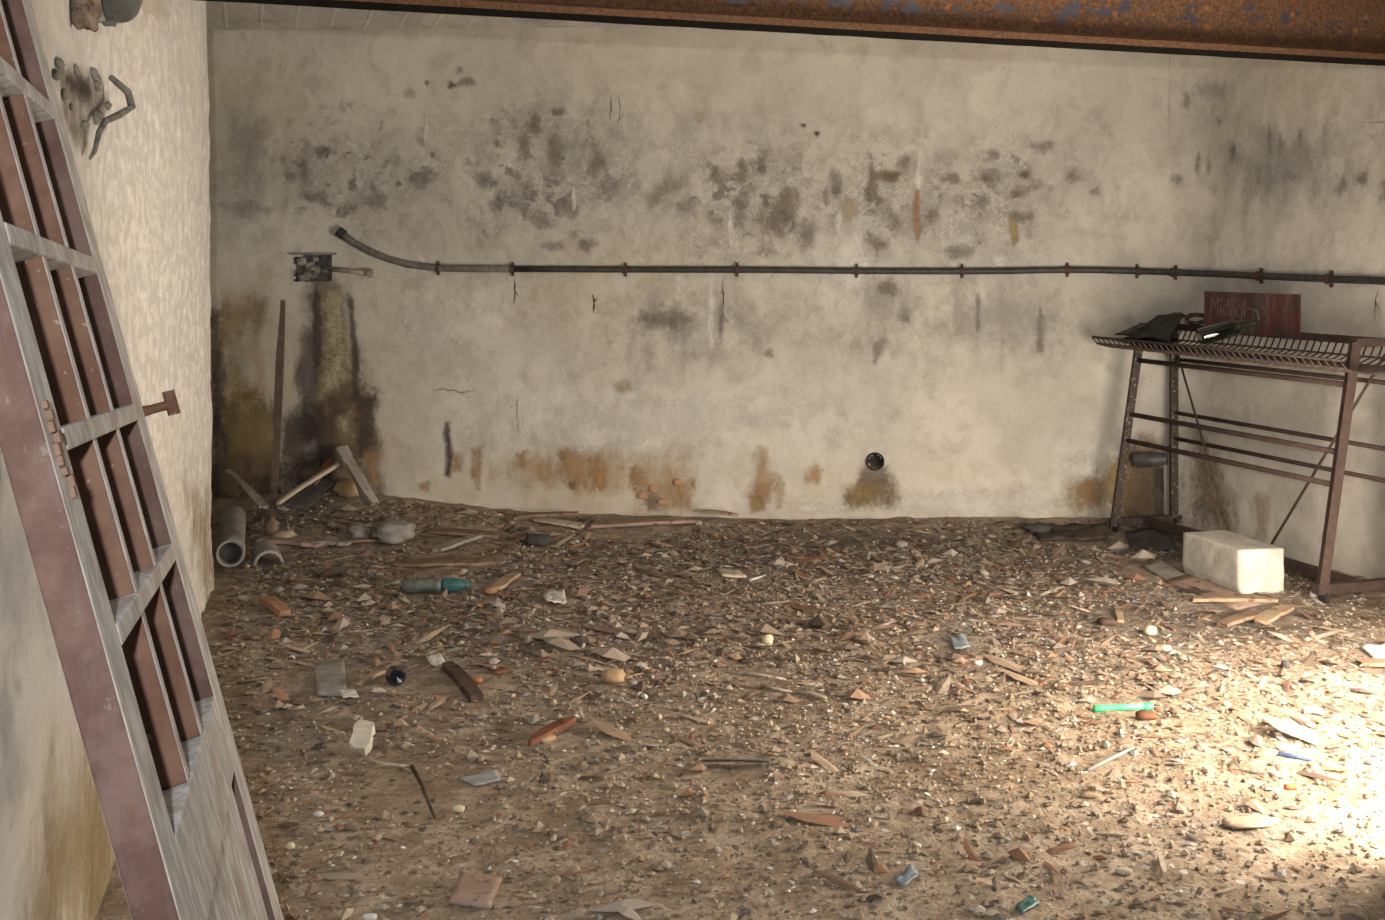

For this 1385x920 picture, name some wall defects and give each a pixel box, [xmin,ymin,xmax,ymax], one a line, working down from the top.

damp [712,141,937,291]
damp [944,139,1035,255]
damp [284,286,382,494]
damp [444,423,460,476]
damp [795,468,1061,517]
damp [1066,456,1101,480]
damp [1117,436,1164,517]